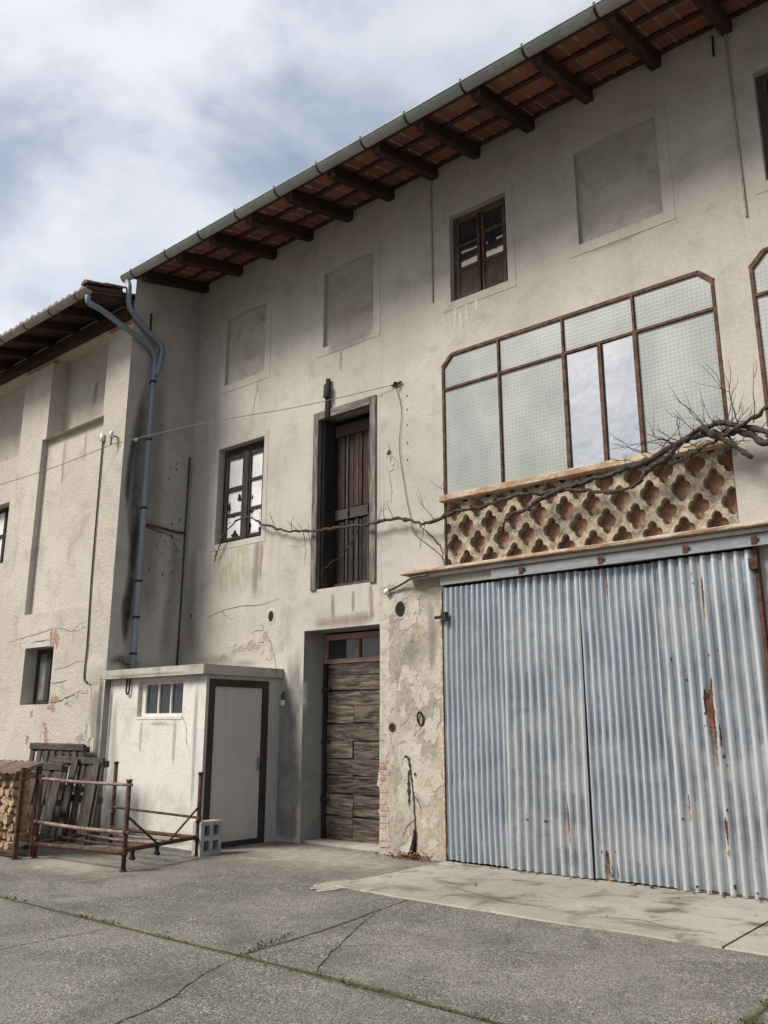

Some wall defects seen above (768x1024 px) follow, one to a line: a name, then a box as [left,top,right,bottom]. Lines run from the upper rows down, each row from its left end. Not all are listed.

damp [124,410,142,635]
spalling [49,627,60,649]
crack [208,598,280,669]
spalling [219,608,276,663]
spalling [377,581,448,862]
rust [703,679,728,767]
rust [601,850,619,882]
crack [316,913,411,972]
crack [114,959,235,1024]